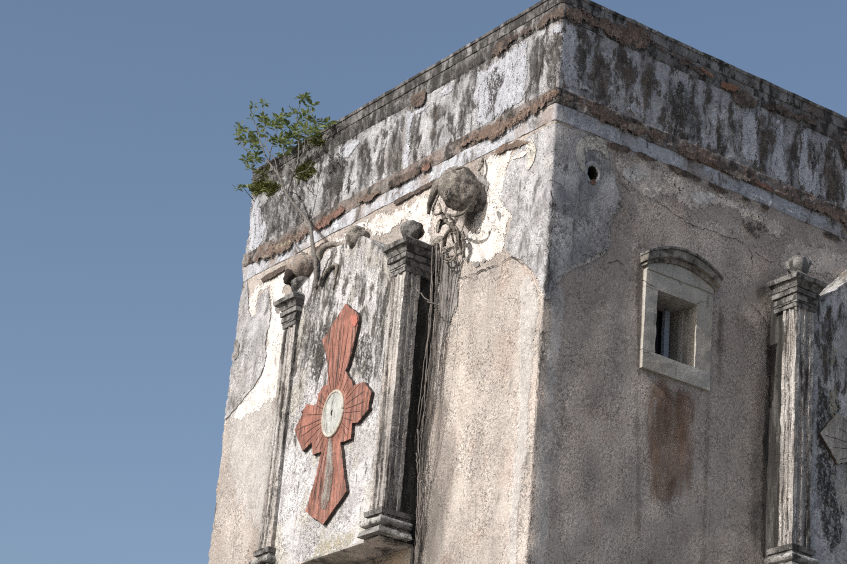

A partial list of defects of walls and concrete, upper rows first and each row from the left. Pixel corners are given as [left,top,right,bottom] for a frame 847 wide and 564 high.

peeling [246,198,345,265]
damp [259,98,445,241]
damp [488,68,504,121]
damp [529,32,560,95]
flaking render [460,7,667,267]
flaking render [575,119,847,277]
peeling [732,90,758,162]
flaking render [229,265,287,523]
damp [303,295,327,383]
peeling [321,437,333,510]
damp [354,272,388,383]
damp [816,306,843,553]